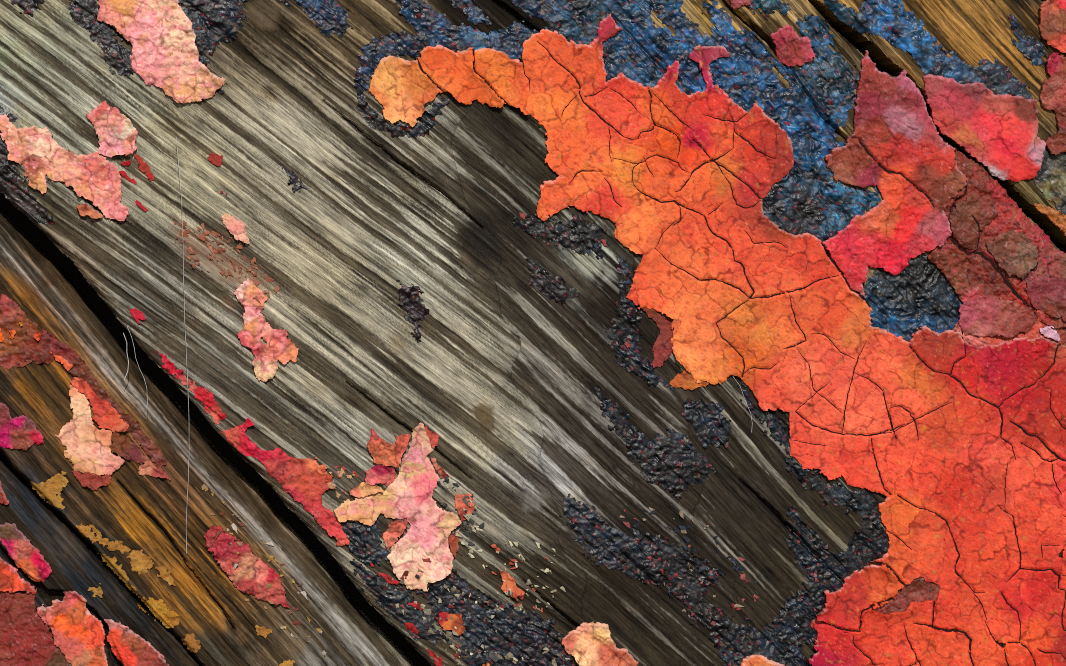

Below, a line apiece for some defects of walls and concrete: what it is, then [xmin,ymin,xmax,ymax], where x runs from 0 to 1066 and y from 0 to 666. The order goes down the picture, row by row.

peeling [97,0,225,104]
crack [472,49,508,105]
peeling [0,101,154,221]
peeling [130,308,145,324]
peeling [233,279,299,382]
peeling [369,14,1066,666]
crack [492,0,1066,666]
peeling [0,481,9,505]
peeling [0,352,171,490]
peeling [155,350,475,610]
peeling [0,522,170,666]